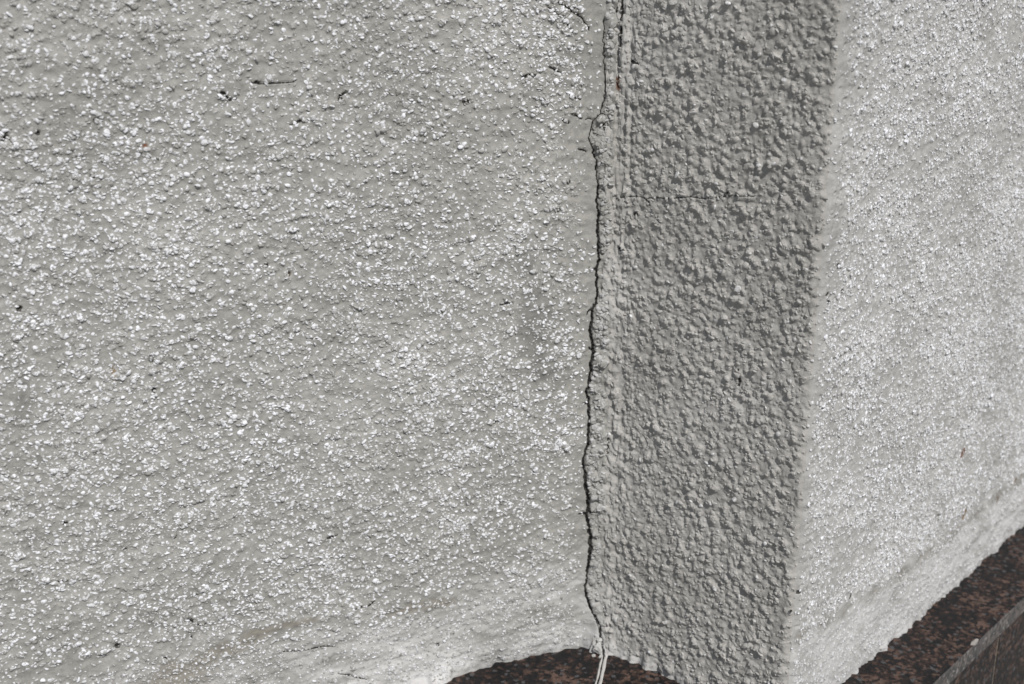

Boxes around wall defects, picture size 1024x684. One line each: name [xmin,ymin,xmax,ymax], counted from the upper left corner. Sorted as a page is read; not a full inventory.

crack [548,0,638,684]